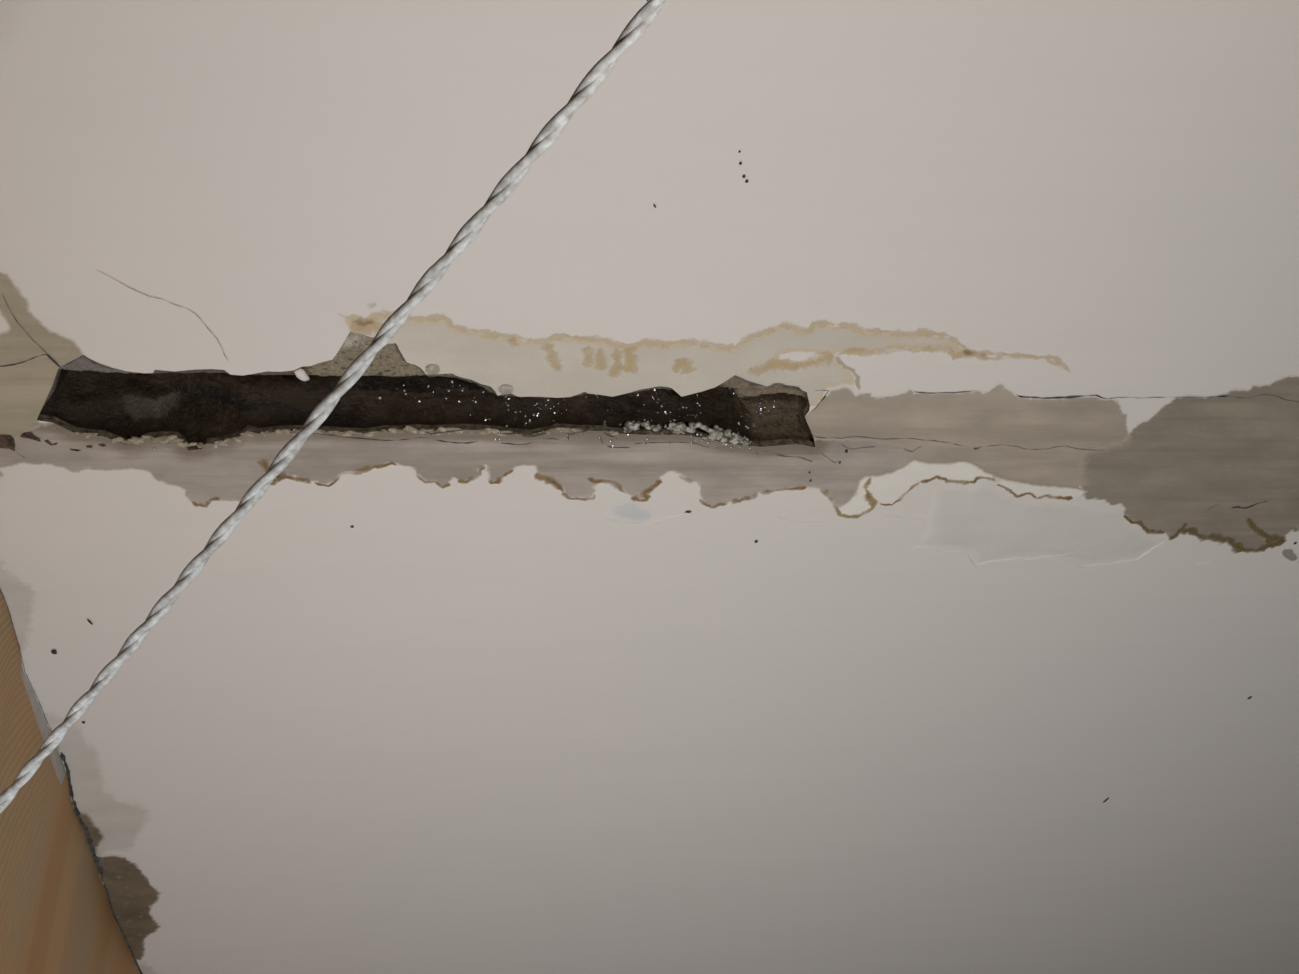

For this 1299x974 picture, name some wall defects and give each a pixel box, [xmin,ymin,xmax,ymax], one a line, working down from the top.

spalling [0,332,814,451]
crack [1207,501,1267,511]